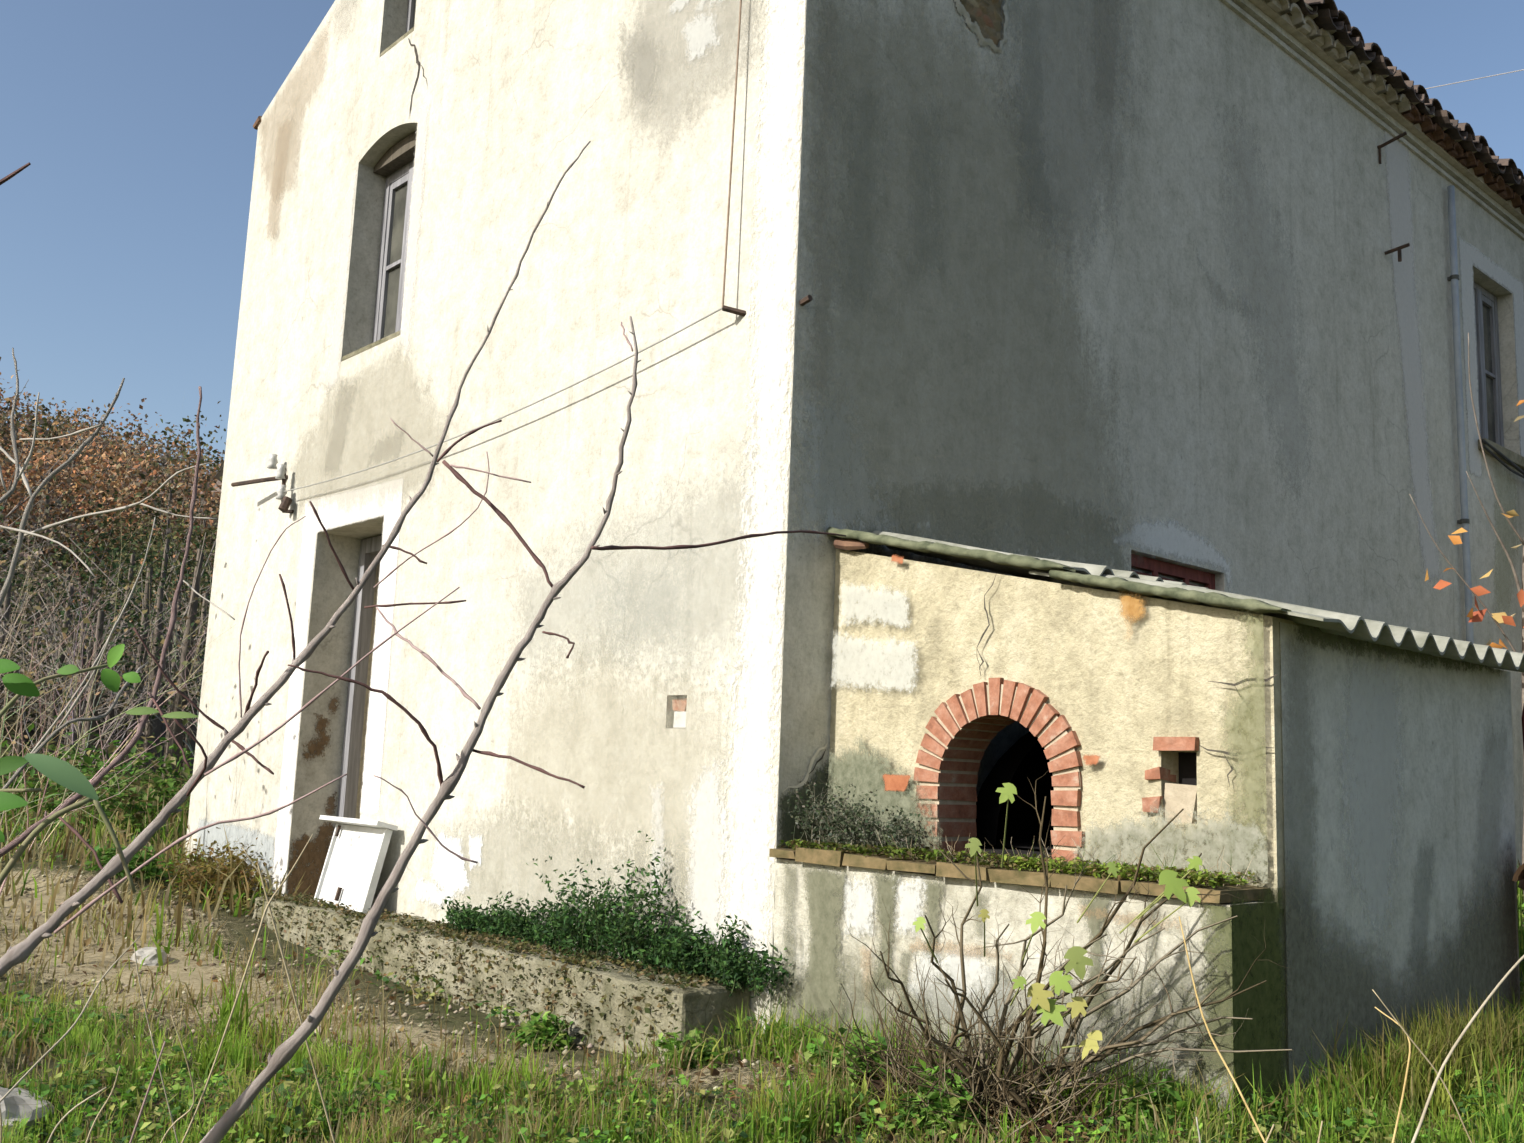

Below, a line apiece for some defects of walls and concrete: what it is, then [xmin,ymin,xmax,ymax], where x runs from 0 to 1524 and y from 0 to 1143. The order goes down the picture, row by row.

crack [408,38,427,116]
leakage [670,0,721,60]
flaking render [954,0,1010,53]
crack [977,573,997,676]
flaking render [302,698,339,761]
leakage [784,866,1011,1033]
leakage [1080,894,1112,1020]
leakage [1285,848,1520,1097]